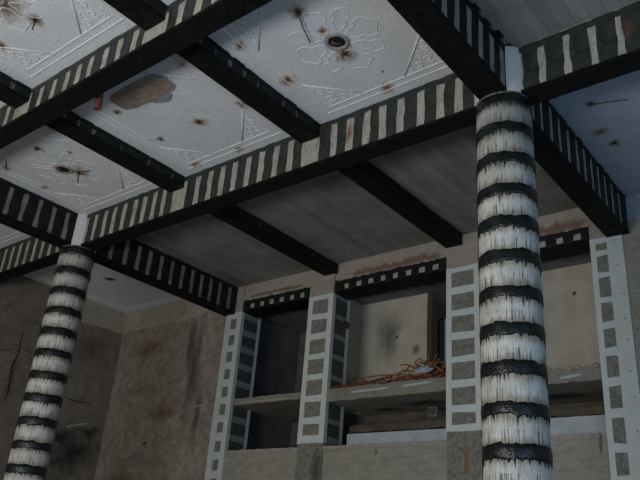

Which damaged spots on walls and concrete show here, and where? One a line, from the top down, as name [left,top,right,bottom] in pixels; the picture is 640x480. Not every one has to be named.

corrosion [339,48,354,60]
spalling [110,74,176,110]
crack [4,333,33,402]